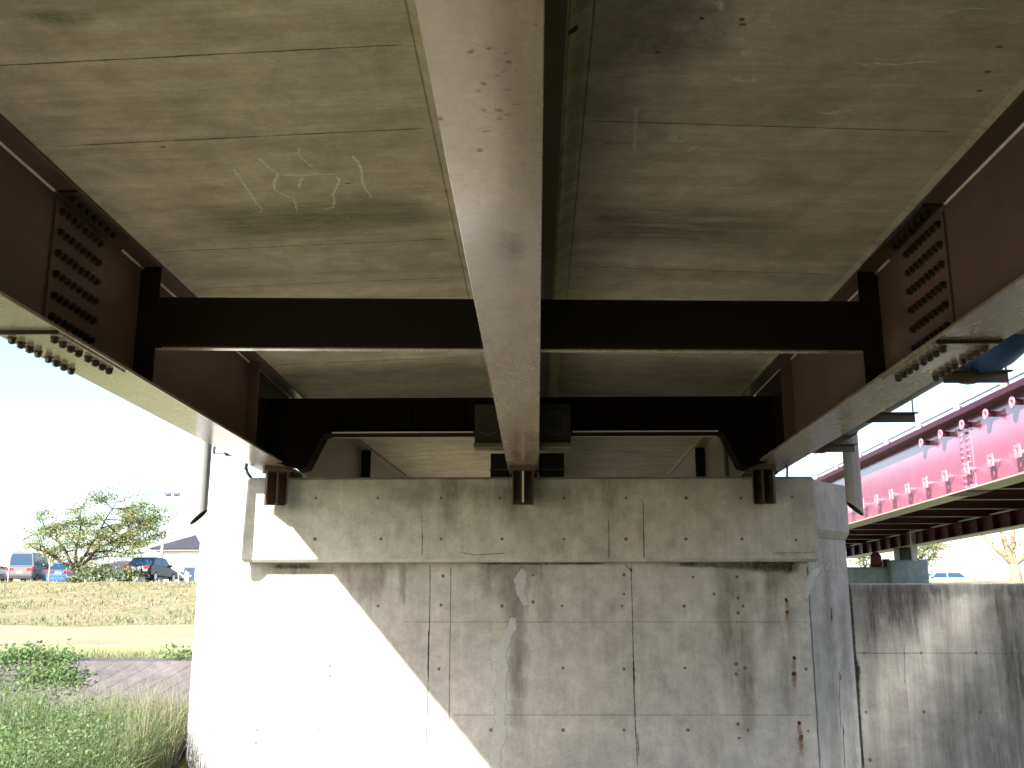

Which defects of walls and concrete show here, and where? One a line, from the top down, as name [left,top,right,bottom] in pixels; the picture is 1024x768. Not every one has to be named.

crack [233,156,372,213]